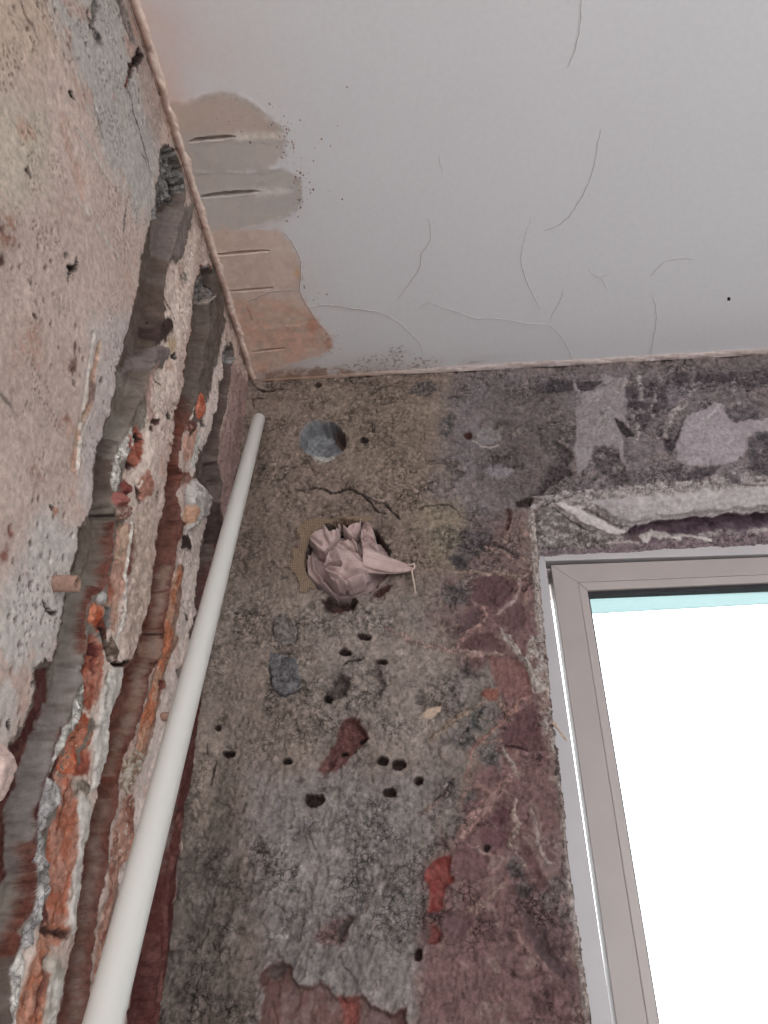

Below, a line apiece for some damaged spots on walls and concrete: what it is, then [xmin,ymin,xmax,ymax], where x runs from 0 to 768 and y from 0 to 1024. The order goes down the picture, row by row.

crack [567,0,583,68]
spalling [62,249,80,285]
crack [247,218,431,343]
crack [520,129,602,360]
flaking render [181,391,207,472]
spalling [203,500,224,547]
crack [294,476,521,558]
spalling [5,716,17,745]
flaking render [15,329,189,1024]
flaking render [411,365,768,1024]